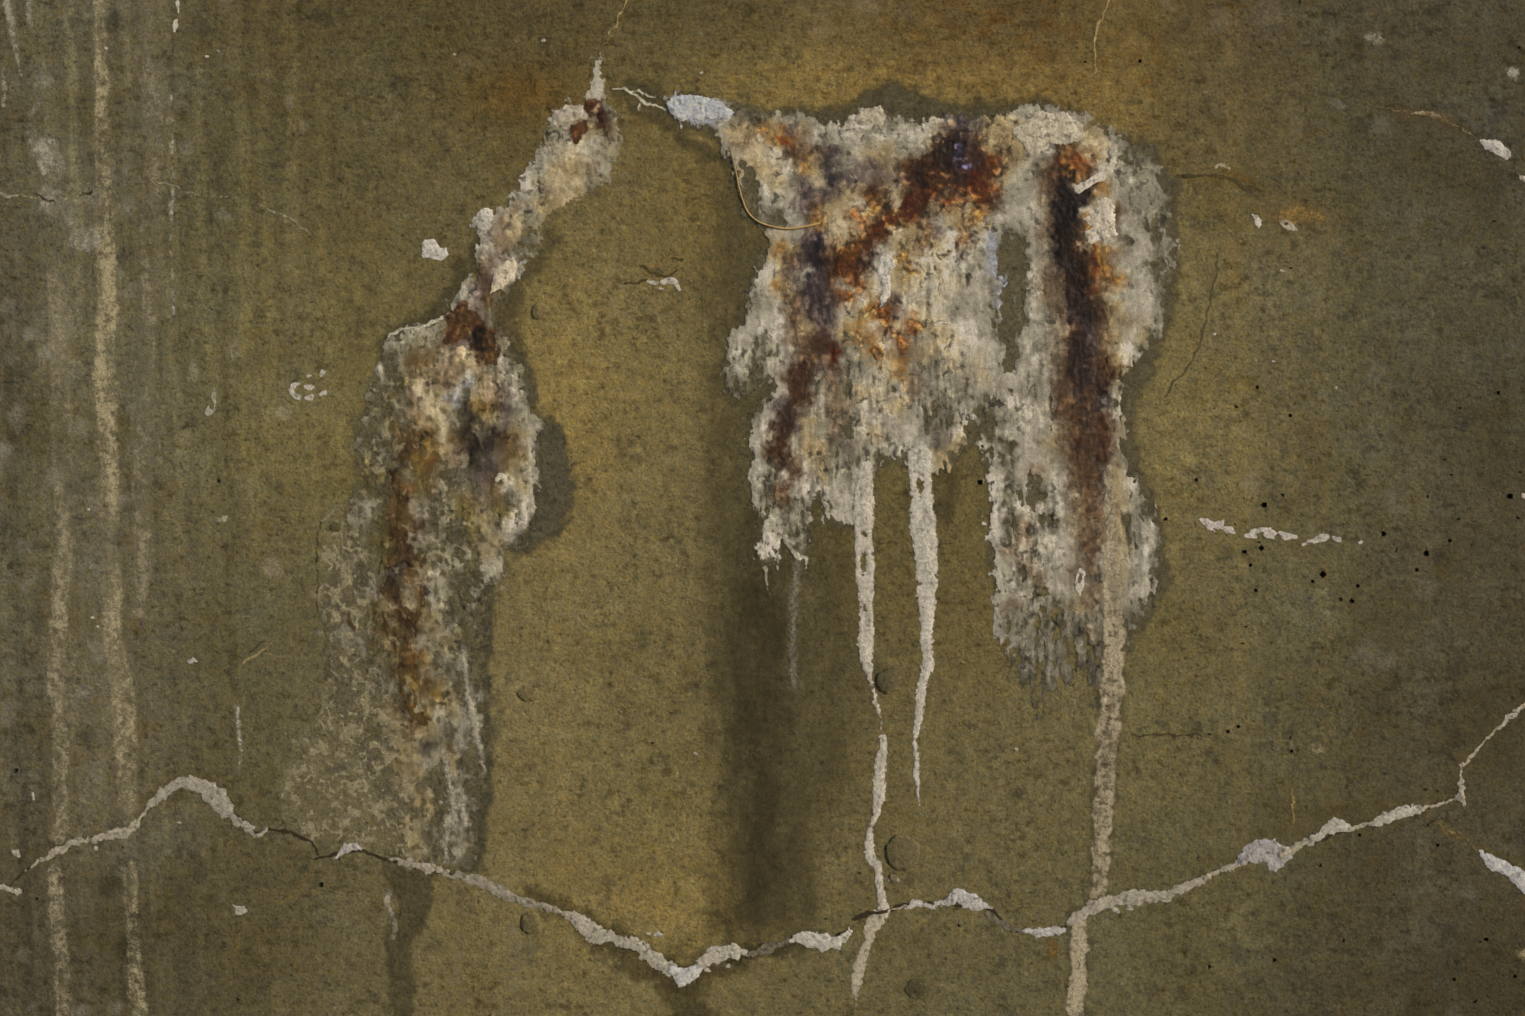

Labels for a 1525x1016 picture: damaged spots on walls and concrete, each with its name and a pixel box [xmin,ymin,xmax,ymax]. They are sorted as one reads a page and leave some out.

efflorescence [1,0,33,107]
corrosion [570,99,607,144]
efflorescence [27,0,175,843]
corrosion [375,478,432,726]
corrosion [443,300,501,366]
leakage [281,52,1183,1016]
corrosion [745,113,1018,514]
corrosion [1036,142,1117,606]
efflorescence [47,865,74,1016]
efflorescence [128,952,147,1016]
crack [0,703,1525,987]